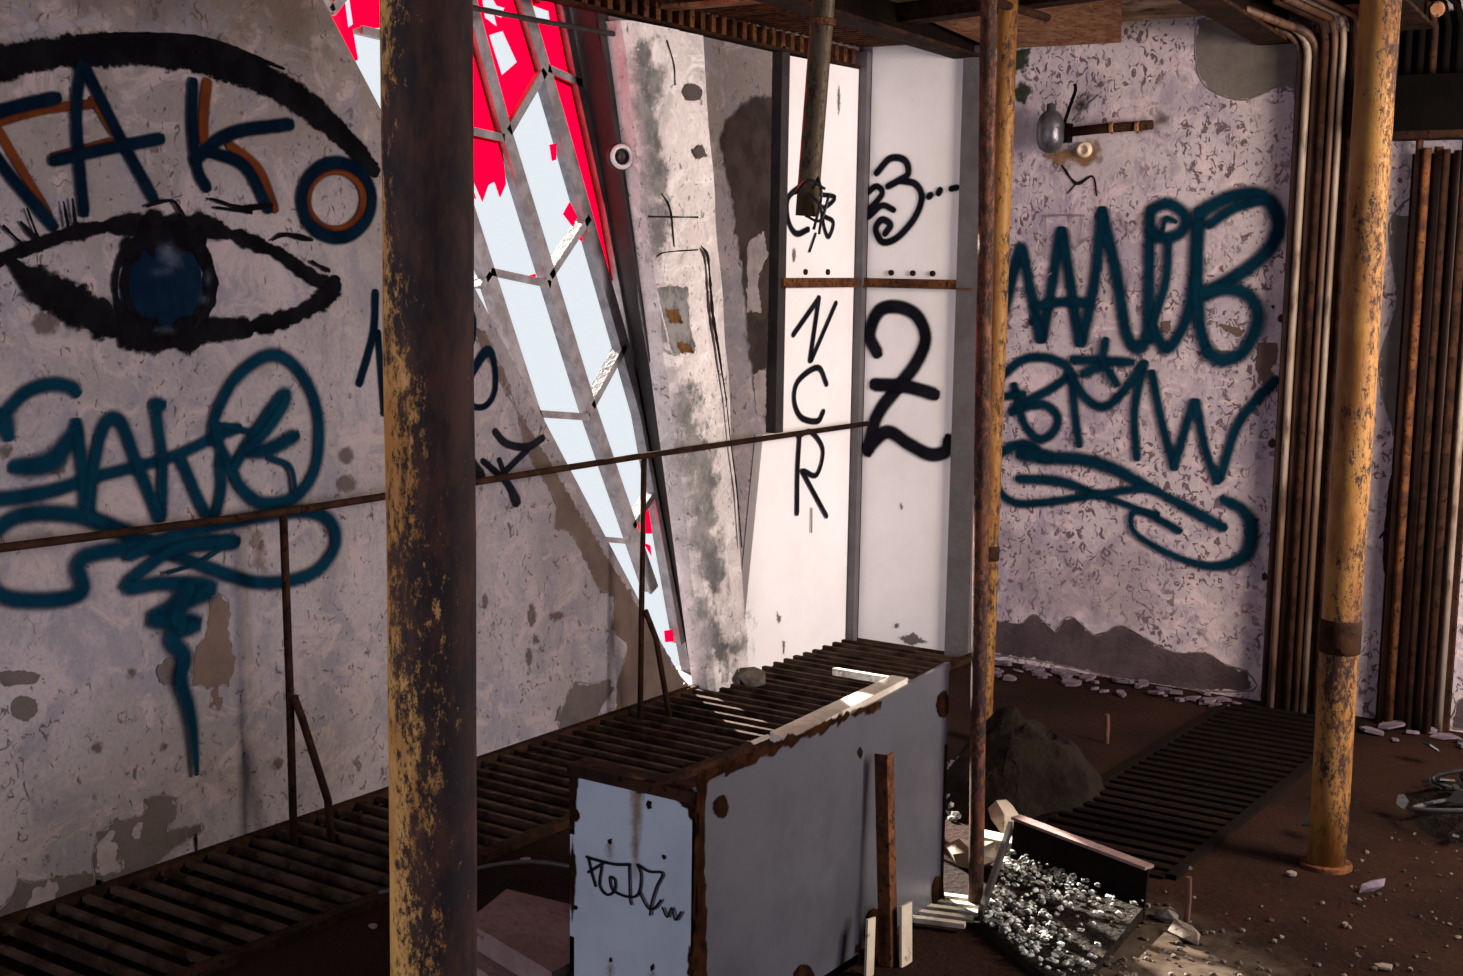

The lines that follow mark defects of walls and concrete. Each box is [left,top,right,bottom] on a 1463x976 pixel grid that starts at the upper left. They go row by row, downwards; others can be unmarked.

leakage [629,35,672,263]
leakage [720,96,772,420]
leakage [674,379,748,684]
flaking render [157,591,236,711]
flaking render [995,614,1258,693]
flaking render [1450,698,1463,731]